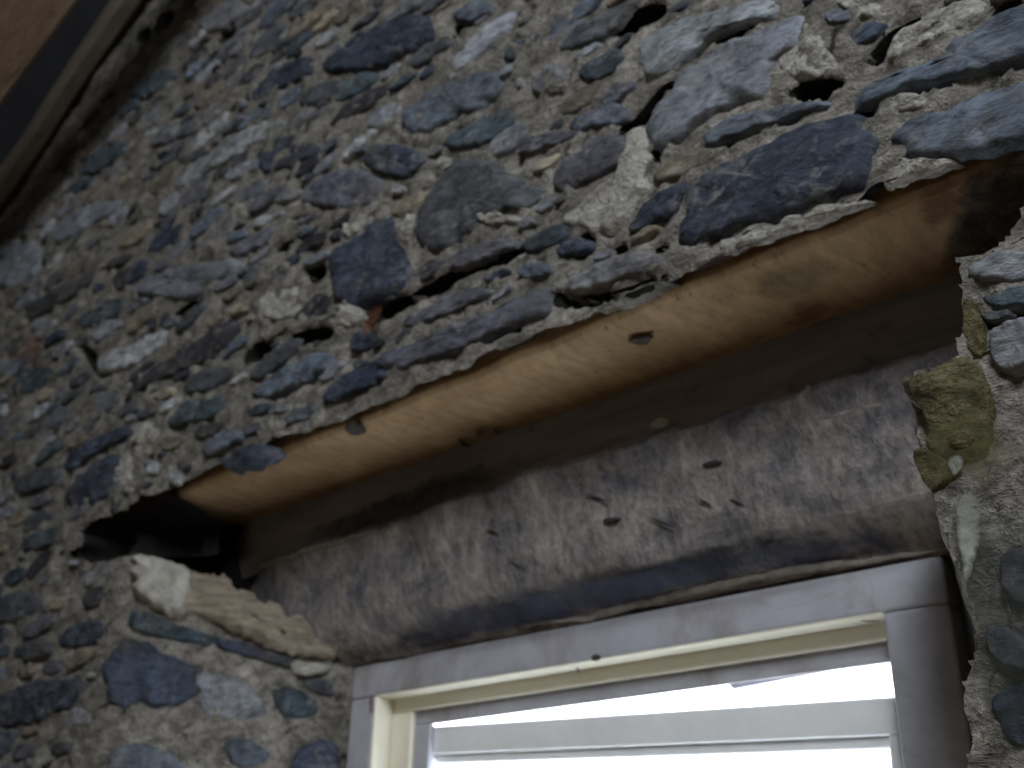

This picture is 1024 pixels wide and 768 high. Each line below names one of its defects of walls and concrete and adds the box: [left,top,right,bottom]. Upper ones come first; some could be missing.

spalling [77,489,256,591]
leakage [402,537,839,649]